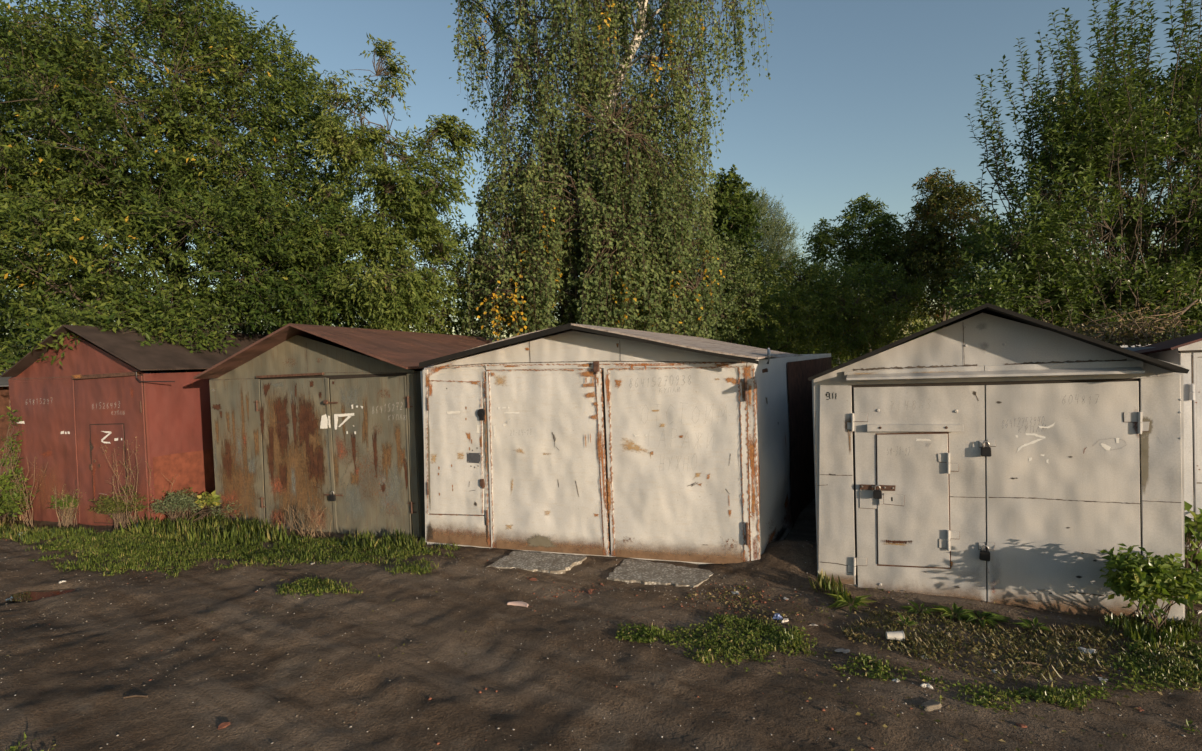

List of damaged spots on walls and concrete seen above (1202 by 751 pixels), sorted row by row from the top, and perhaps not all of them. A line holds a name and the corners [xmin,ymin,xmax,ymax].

rust [212,381,408,526]